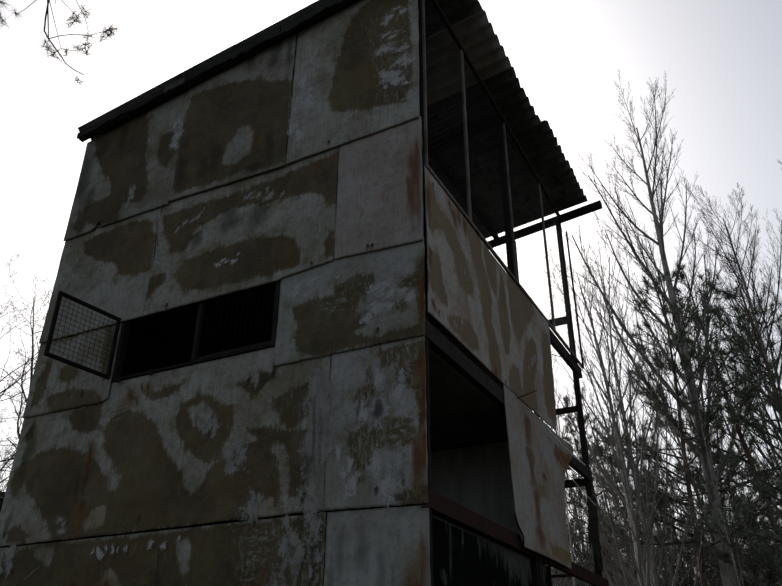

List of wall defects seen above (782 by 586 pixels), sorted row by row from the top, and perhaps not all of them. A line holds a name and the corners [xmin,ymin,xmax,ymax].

peeling [373,6,418,91]
peeling [335,365,413,511]
peeling [90,544,127,560]
peeling [263,510,325,586]